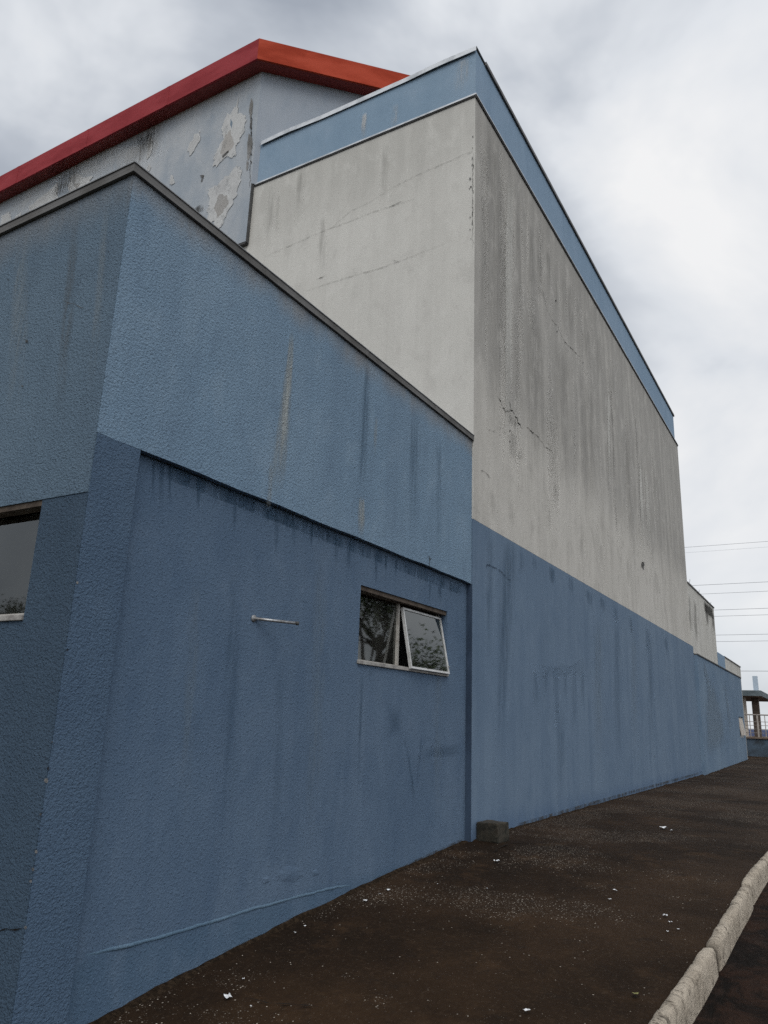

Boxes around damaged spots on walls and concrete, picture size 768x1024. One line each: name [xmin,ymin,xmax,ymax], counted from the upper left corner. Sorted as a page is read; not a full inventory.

peeling [207,98,253,228]